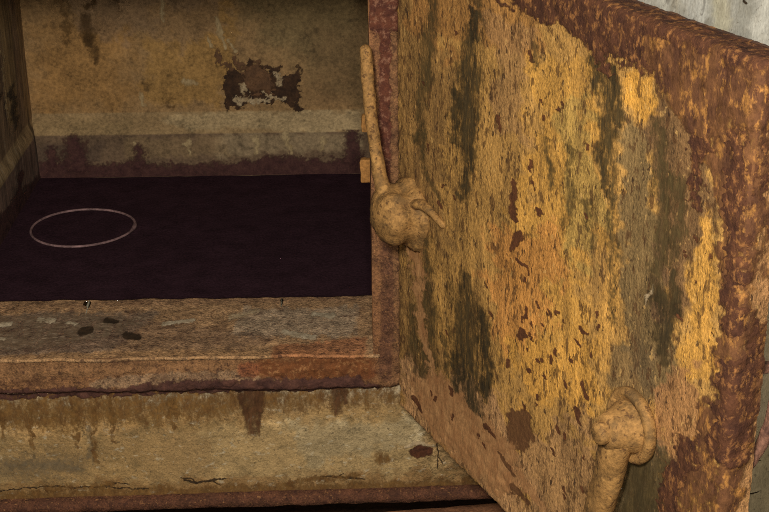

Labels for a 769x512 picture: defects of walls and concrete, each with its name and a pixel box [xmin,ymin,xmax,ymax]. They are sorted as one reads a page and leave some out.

peeling [214,50,304,112]
corrosion [369,0,399,182]
corrosion [496,0,769,512]
corrosion [0,357,400,463]